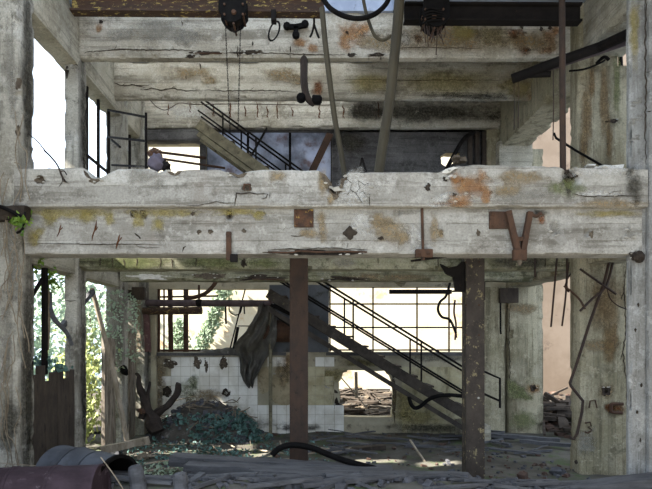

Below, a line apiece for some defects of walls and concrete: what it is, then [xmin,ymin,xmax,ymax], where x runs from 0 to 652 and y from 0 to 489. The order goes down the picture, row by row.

rust [340,24,370,49]
crack [76,45,201,70]
crack [115,76,294,118]
mould [351,103,383,118]
damp [393,73,531,123]
damp [580,59,613,162]
spalling [320,173,373,202]
crack [346,179,370,205]
rust [442,171,491,206]
damp [372,210,413,243]
damp [585,279,622,362]
spalling [192,356,208,373]